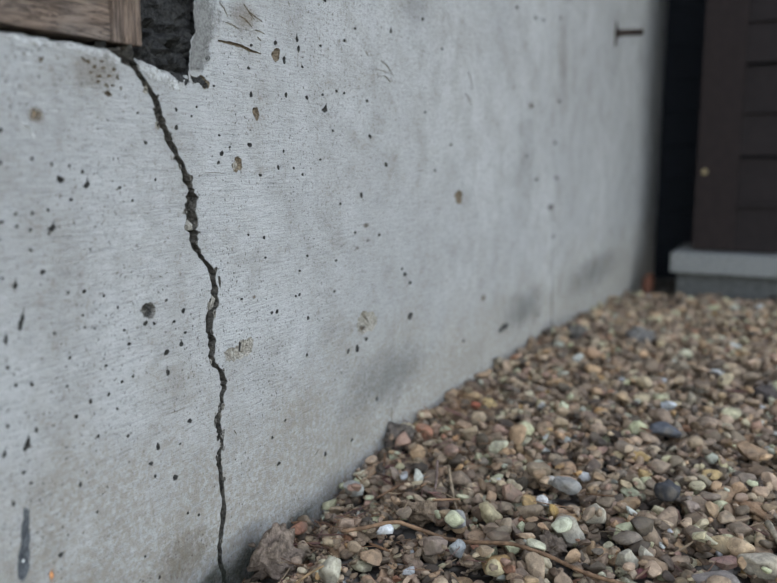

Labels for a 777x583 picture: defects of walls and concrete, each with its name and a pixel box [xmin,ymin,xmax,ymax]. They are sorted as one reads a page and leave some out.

crack [107,44,227,582]